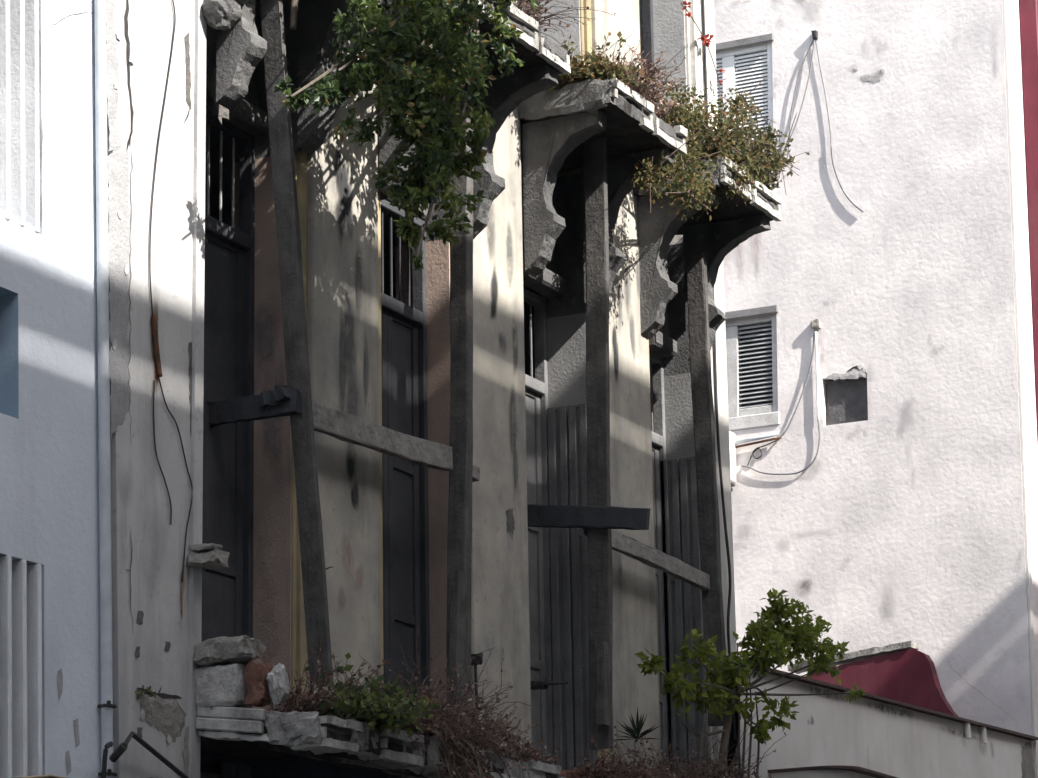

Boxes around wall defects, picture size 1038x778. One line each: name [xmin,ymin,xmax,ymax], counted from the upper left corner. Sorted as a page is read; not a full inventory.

peeling [106,0,131,441]
crack [125,0,134,433]
water stain [336,149,352,235]
spalling [137,687,190,776]